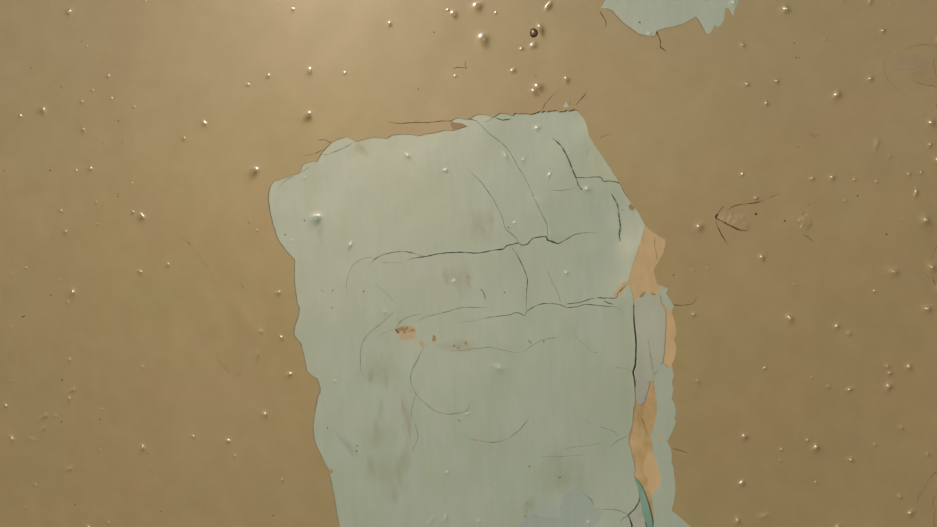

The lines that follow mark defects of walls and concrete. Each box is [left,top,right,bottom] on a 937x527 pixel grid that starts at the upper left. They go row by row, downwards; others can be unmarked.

peeling [600,0,734,37]
peeling [268,102,690,527]
crack [346,118,624,366]